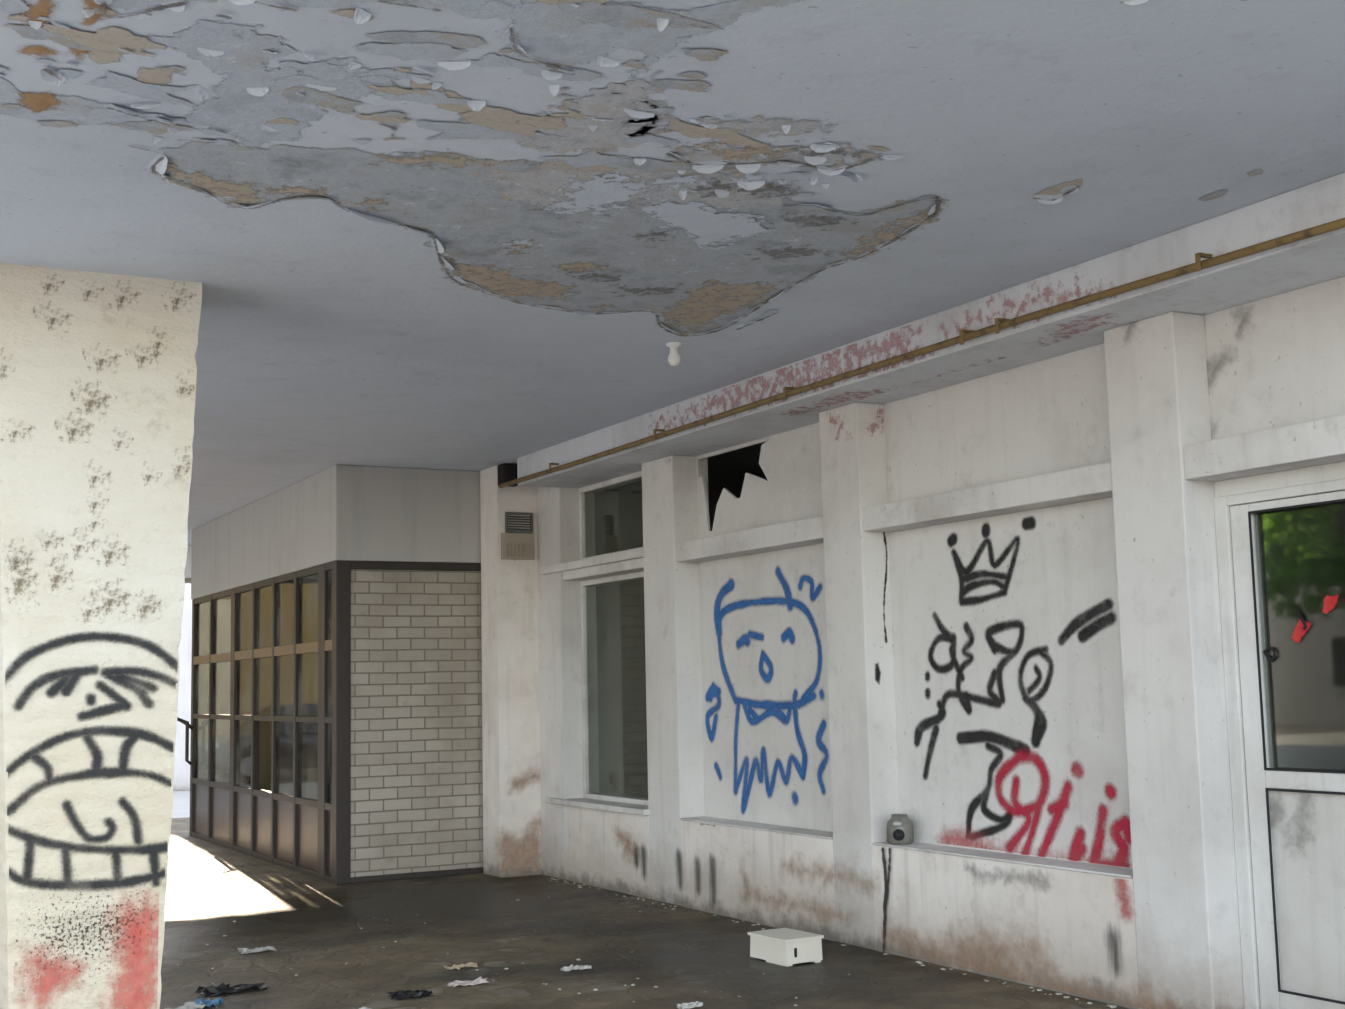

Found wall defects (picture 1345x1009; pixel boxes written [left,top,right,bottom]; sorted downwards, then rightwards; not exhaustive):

peeling [0,0,948,337]
peeling [1034,178,1082,204]
water stain [55,334,163,440]
mould [6,500,127,594]
water stain [84,583,160,619]
water stain [677,851,714,903]
crack [881,848,891,952]
water stain [1110,931,1118,970]